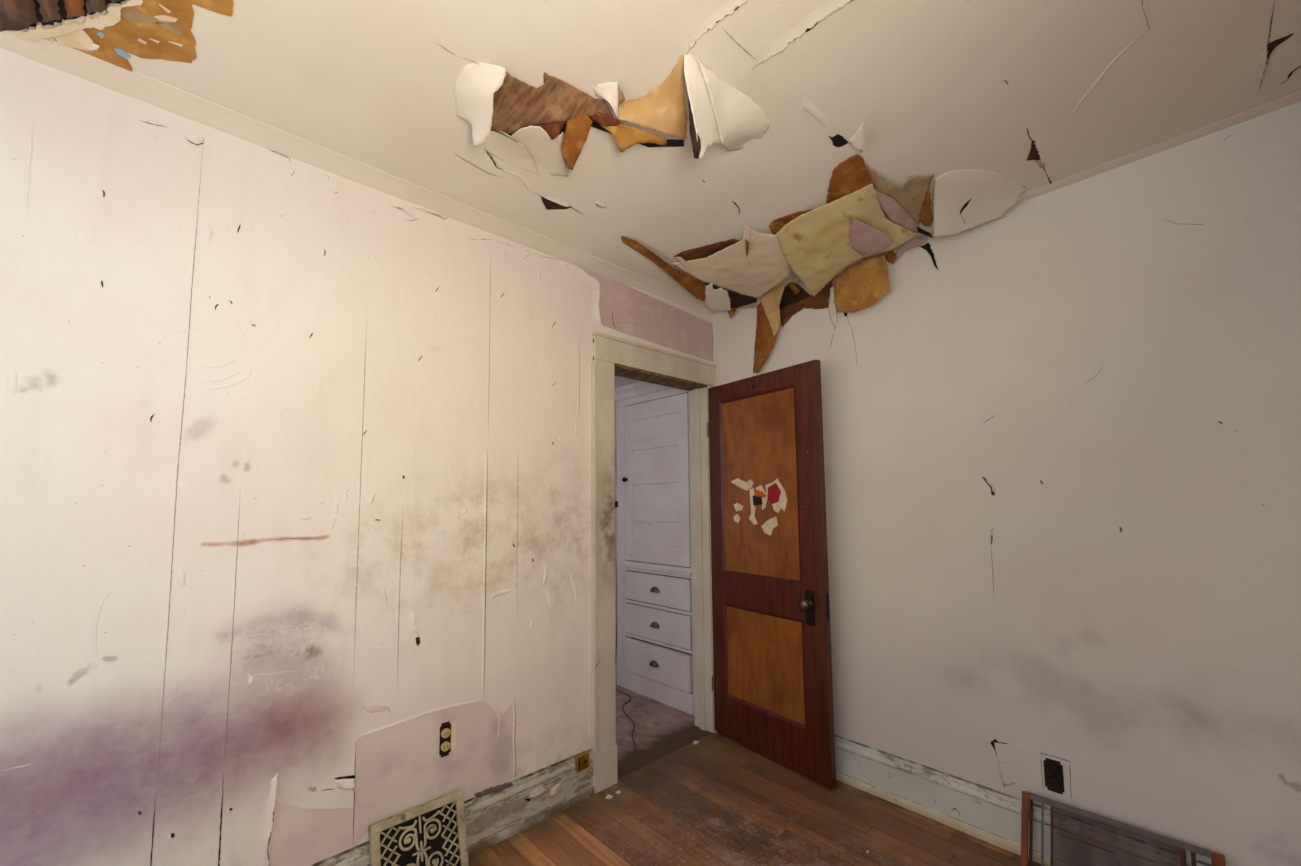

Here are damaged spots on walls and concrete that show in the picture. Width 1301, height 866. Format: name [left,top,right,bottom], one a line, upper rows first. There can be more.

flaking render [0,0,143,44]
crack [1258,0,1275,94]
peeling [466,782,561,837]